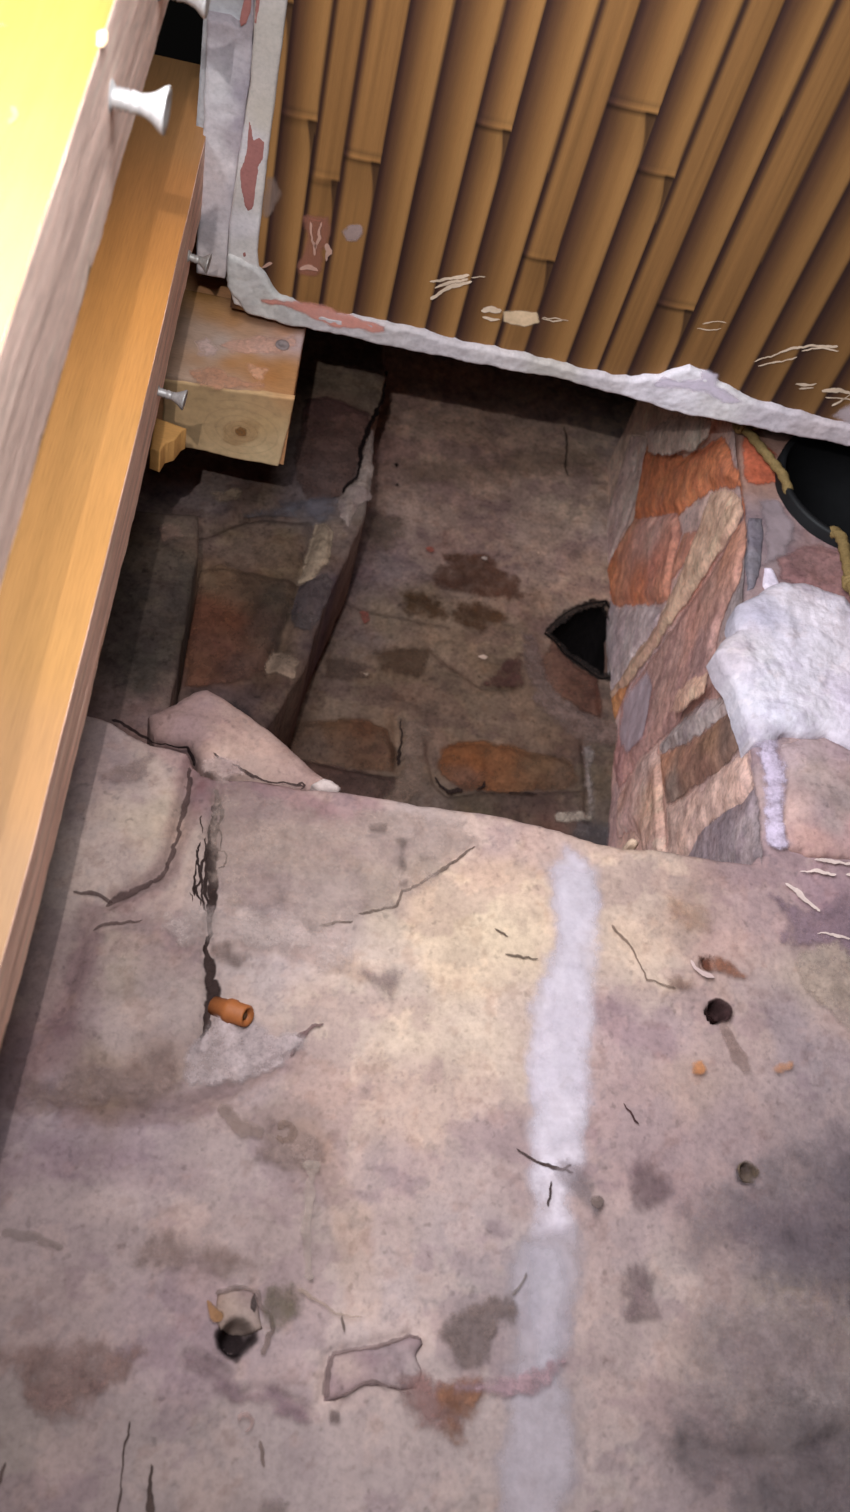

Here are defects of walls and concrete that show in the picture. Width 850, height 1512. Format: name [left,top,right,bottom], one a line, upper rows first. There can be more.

peeling [240,122,264,211]
flaking render [294,396,373,527]
flaking render [288,718,398,799]
crack [73,719,306,1041]
crack [321,846,475,926]
leakage [537,875,595,1146]
flaking render [185,1018,303,1085]
spalling [215,1328,257,1361]
flaking render [324,1334,422,1401]
corrosion [402,1374,482,1437]
flaking render [442,1296,517,1366]
leakage [455,1229,579,1512]